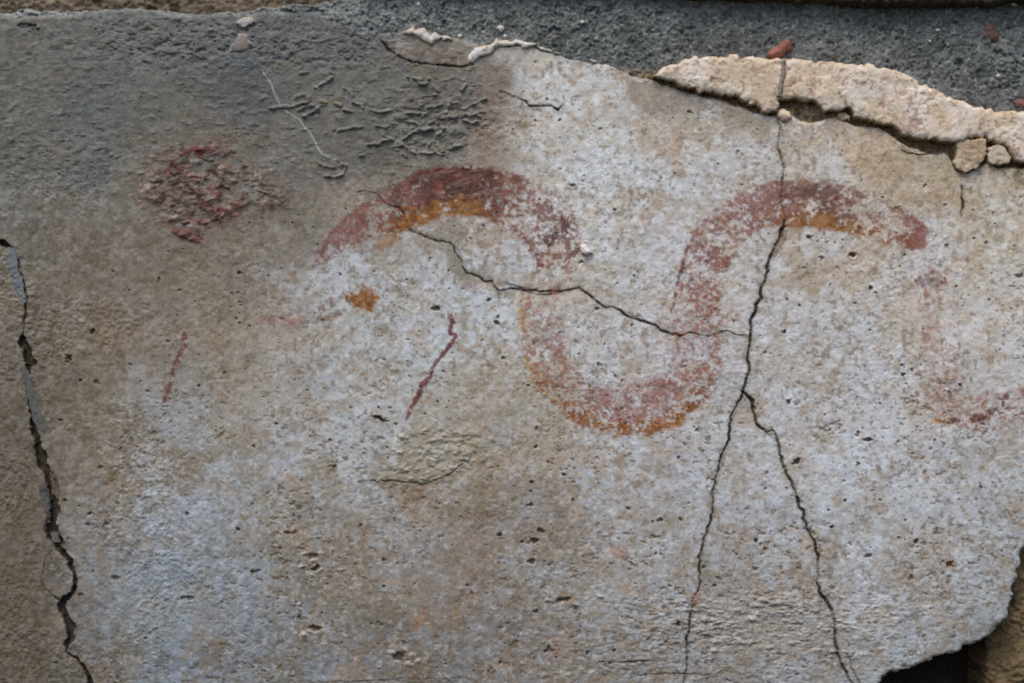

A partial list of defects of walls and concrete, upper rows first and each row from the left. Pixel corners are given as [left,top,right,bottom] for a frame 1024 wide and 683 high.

flaking render [394,27,537,65]
crack [776,59,786,98]
crack [419,233,487,282]
crack [618,309,680,337]
crack [715,181,820,561]
crack [0,240,93,683]
crack [698,509,713,573]